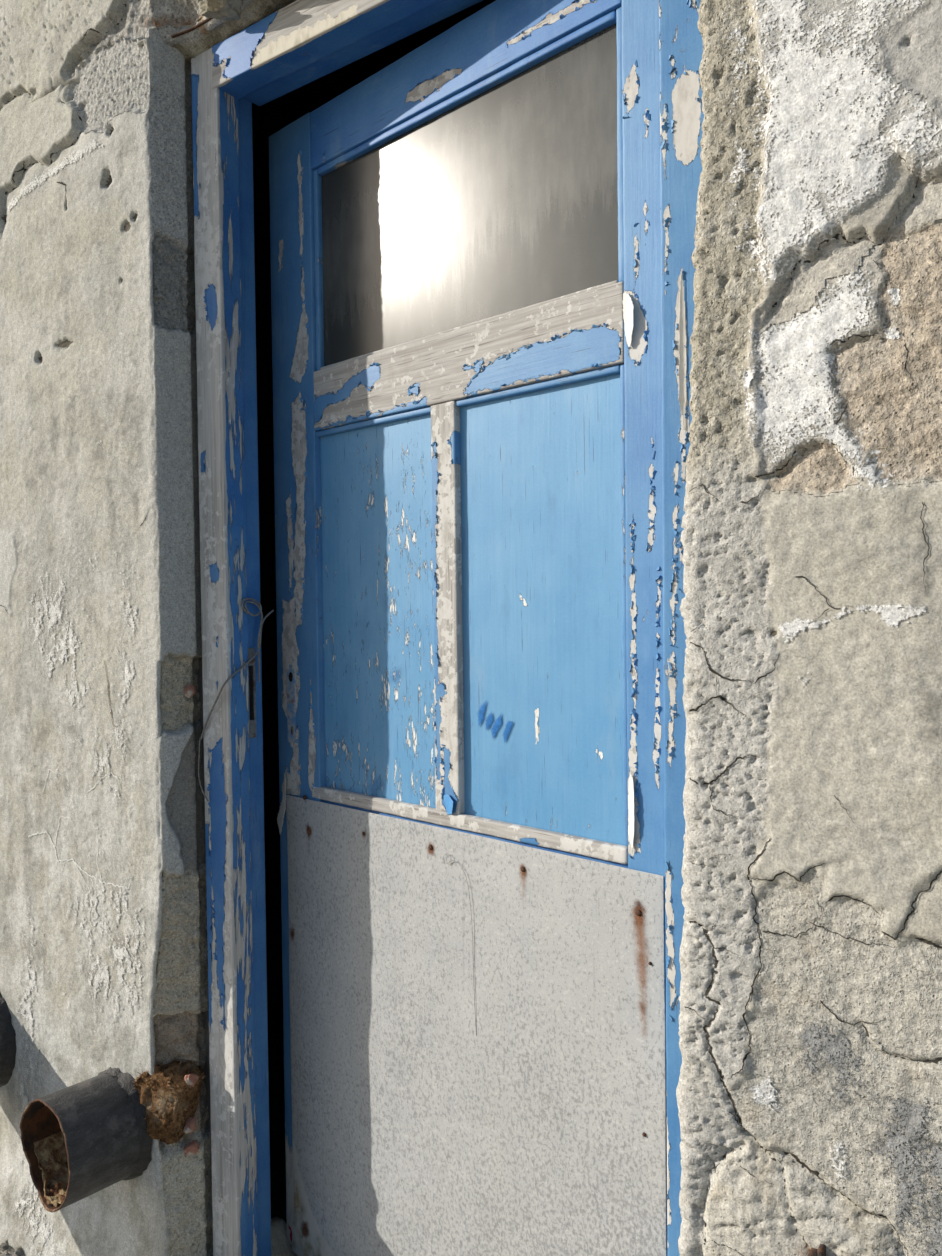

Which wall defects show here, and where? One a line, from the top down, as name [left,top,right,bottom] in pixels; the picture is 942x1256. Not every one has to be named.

crack [5,97,82,199]
peeling [622,60,674,150]
peeling [720,0,942,499]
peeling [463,323,606,387]
peeling [618,292,649,365]
peeling [664,271,690,496]
crack [920,502,930,589]
peeling [653,519,684,773]
peeling [628,762,640,858]
crack [690,754,758,816]
rust [634,902,645,974]
crack [684,838,942,1256]